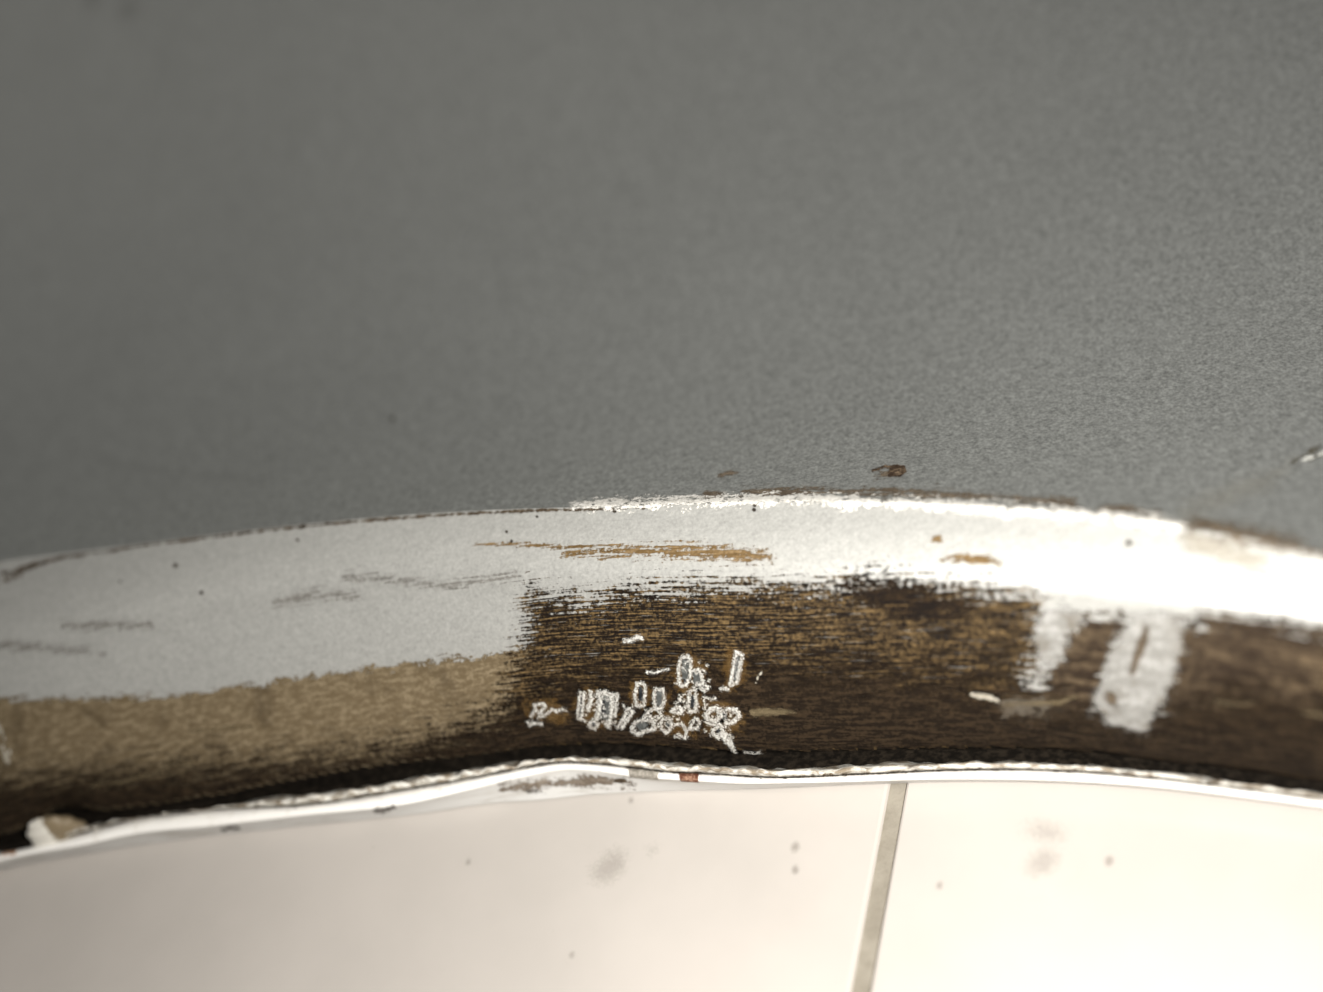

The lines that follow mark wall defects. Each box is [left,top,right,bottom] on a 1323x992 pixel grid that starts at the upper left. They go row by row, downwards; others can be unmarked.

water stain [1029,605,1086,671]
water stain [1091,610,1186,731]
peeling [629,768,659,780]
peeling [679,772,699,783]